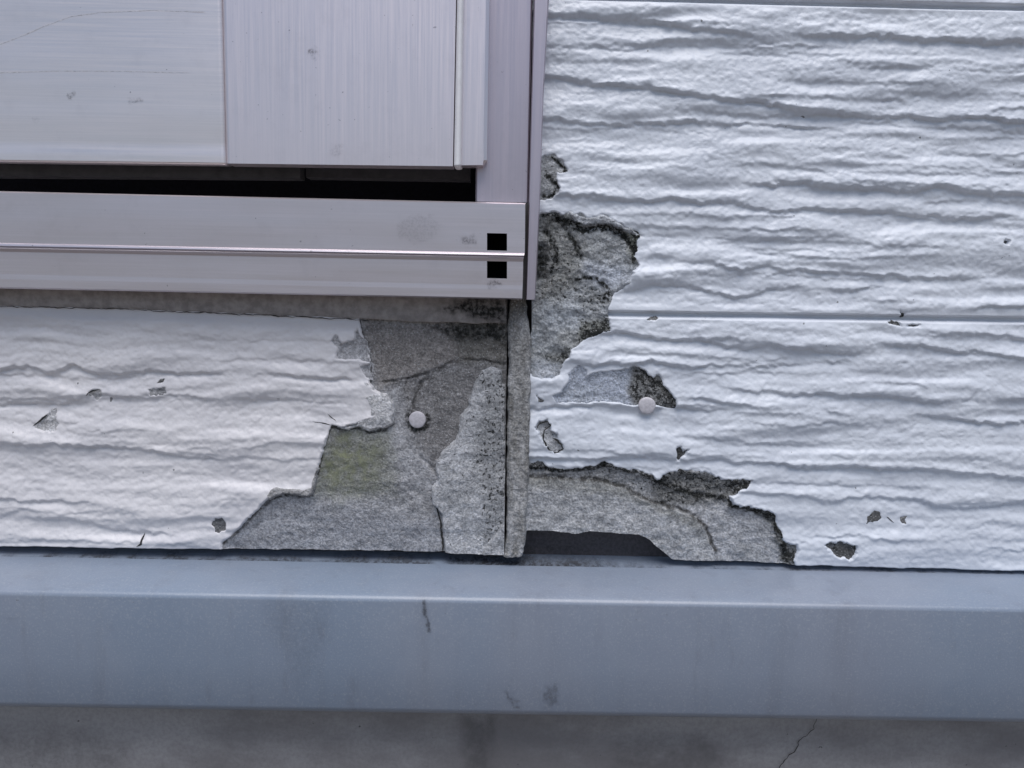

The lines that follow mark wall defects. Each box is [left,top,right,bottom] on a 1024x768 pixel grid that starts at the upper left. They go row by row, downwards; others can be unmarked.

spalling [540,154,568,200]
spalling [530,211,676,408]
peeling [33,408,59,432]
peeling [212,299,507,555]
peeling [536,420,564,454]
spalling [526,447,797,565]
peeling [866,510,881,524]
peeling [826,541,856,560]